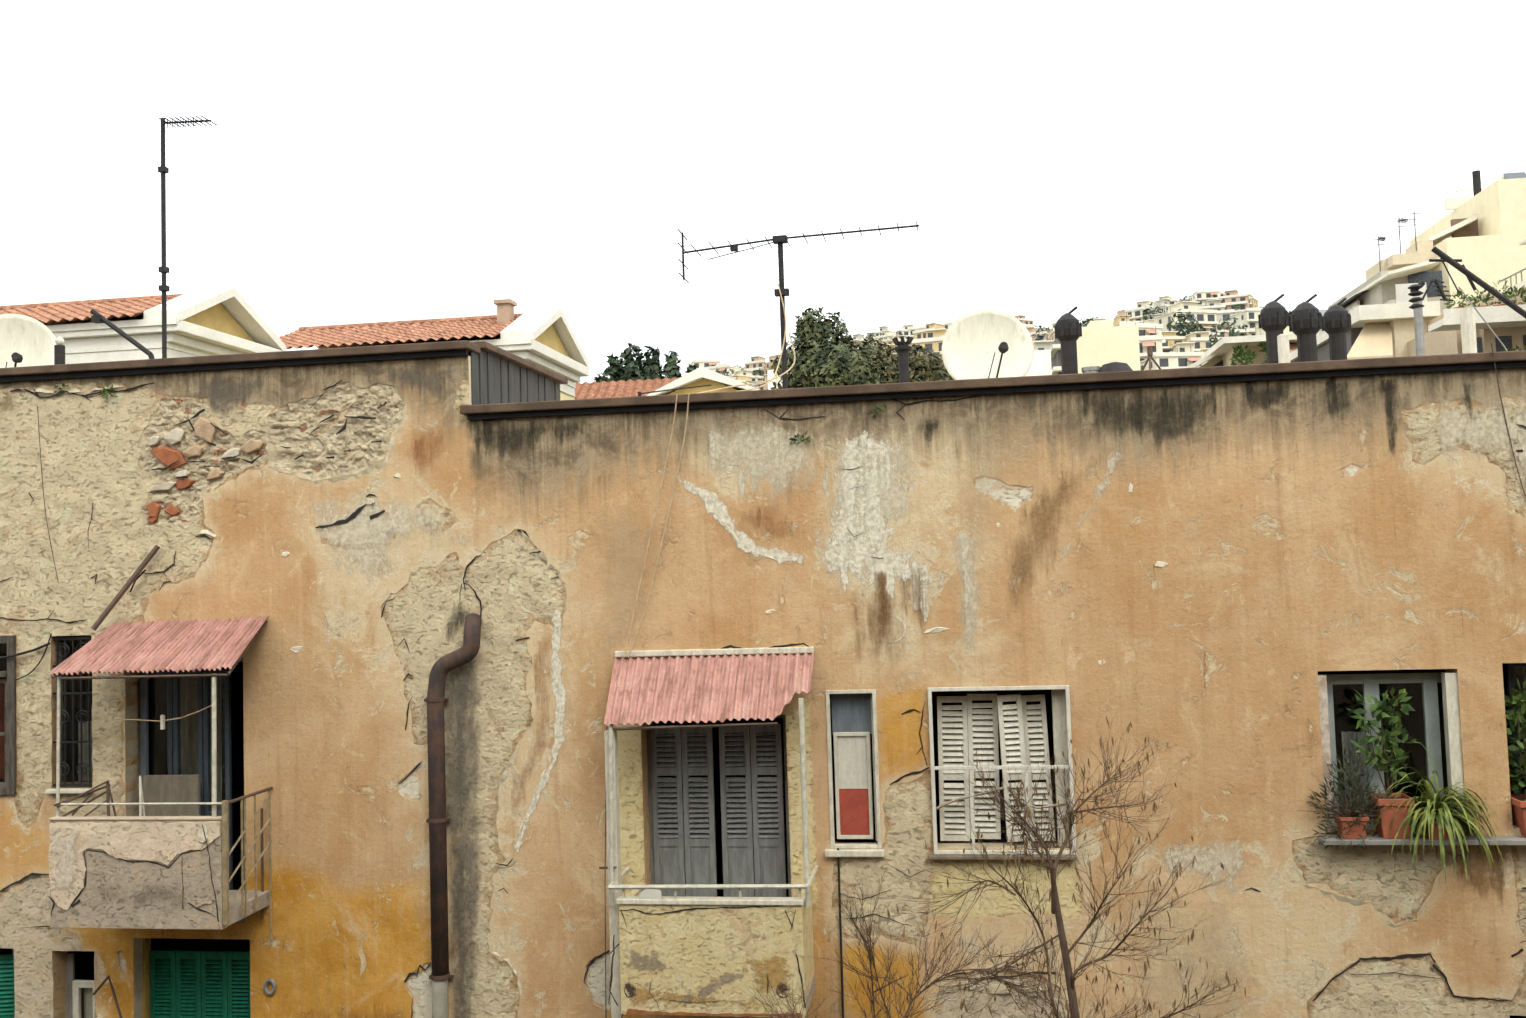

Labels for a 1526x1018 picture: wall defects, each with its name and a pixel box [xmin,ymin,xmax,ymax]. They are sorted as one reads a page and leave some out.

leakage [1082,388,1216,443]
leakage [1247,383,1288,408]
leakage [1382,381,1397,451]
leakage [1096,453,1119,498]
flaking render [682,431,940,621]
leakage [954,532,979,648]
flaking render [0,380,405,1018]
flaking render [381,528,567,1018]
crack [48,852,87,916]
crack [181,825,219,922]
flaking render [1292,829,1467,928]
flaking render [1307,845,1526,1018]